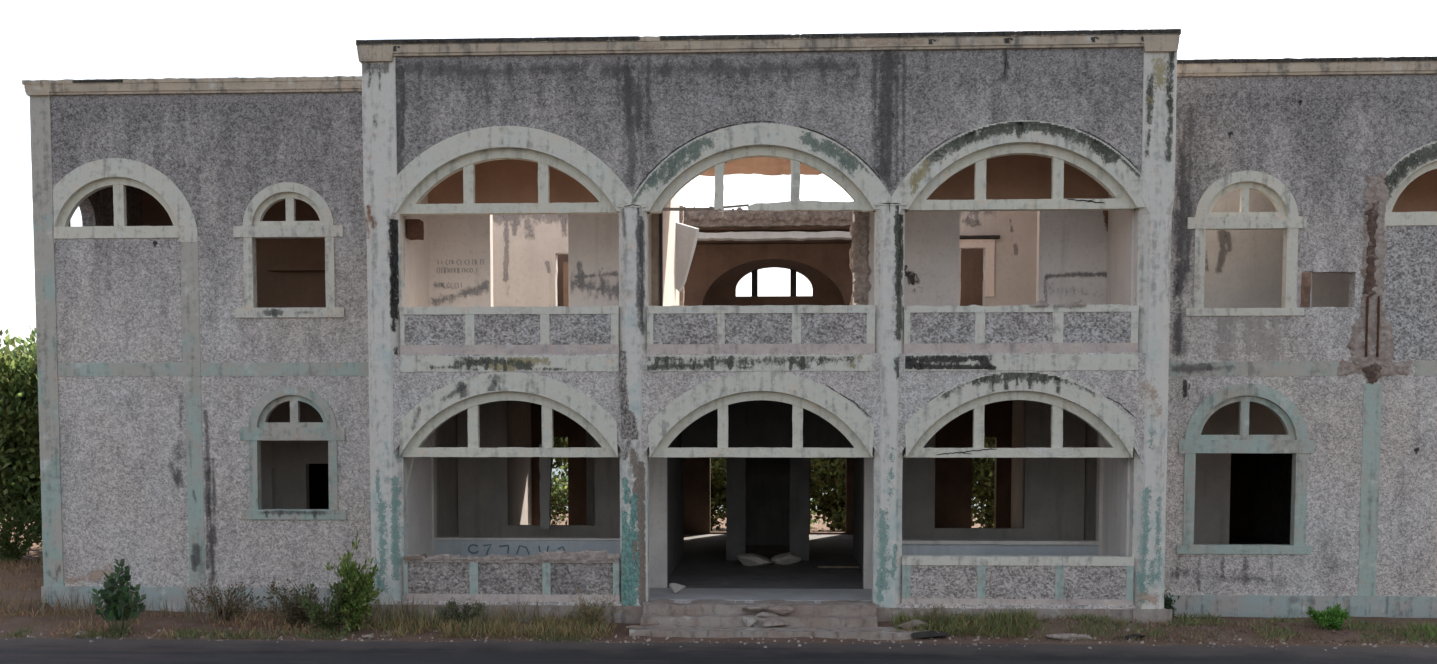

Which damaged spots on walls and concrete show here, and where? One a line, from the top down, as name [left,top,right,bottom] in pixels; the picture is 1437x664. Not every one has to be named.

damp [50,29,1181,305]
damp [653,355,733,370]
damp [789,356,822,370]
damp [905,355,1095,398]
spalling [1337,172,1413,384]
damp [191,412,216,585]